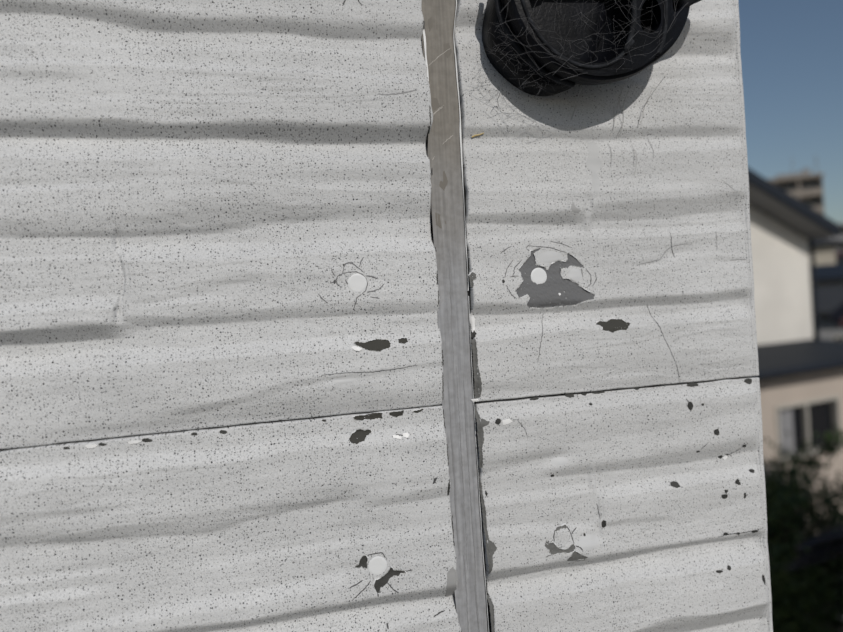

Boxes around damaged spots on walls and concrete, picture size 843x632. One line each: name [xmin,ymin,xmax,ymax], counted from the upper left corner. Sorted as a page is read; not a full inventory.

crack [319,257,384,309]
peeling [516,248,595,308]
peeling [596,319,630,332]
peeling [351,338,408,351]
peeling [349,409,423,444]
peeling [545,541,588,561]
peeling [374,567,406,593]